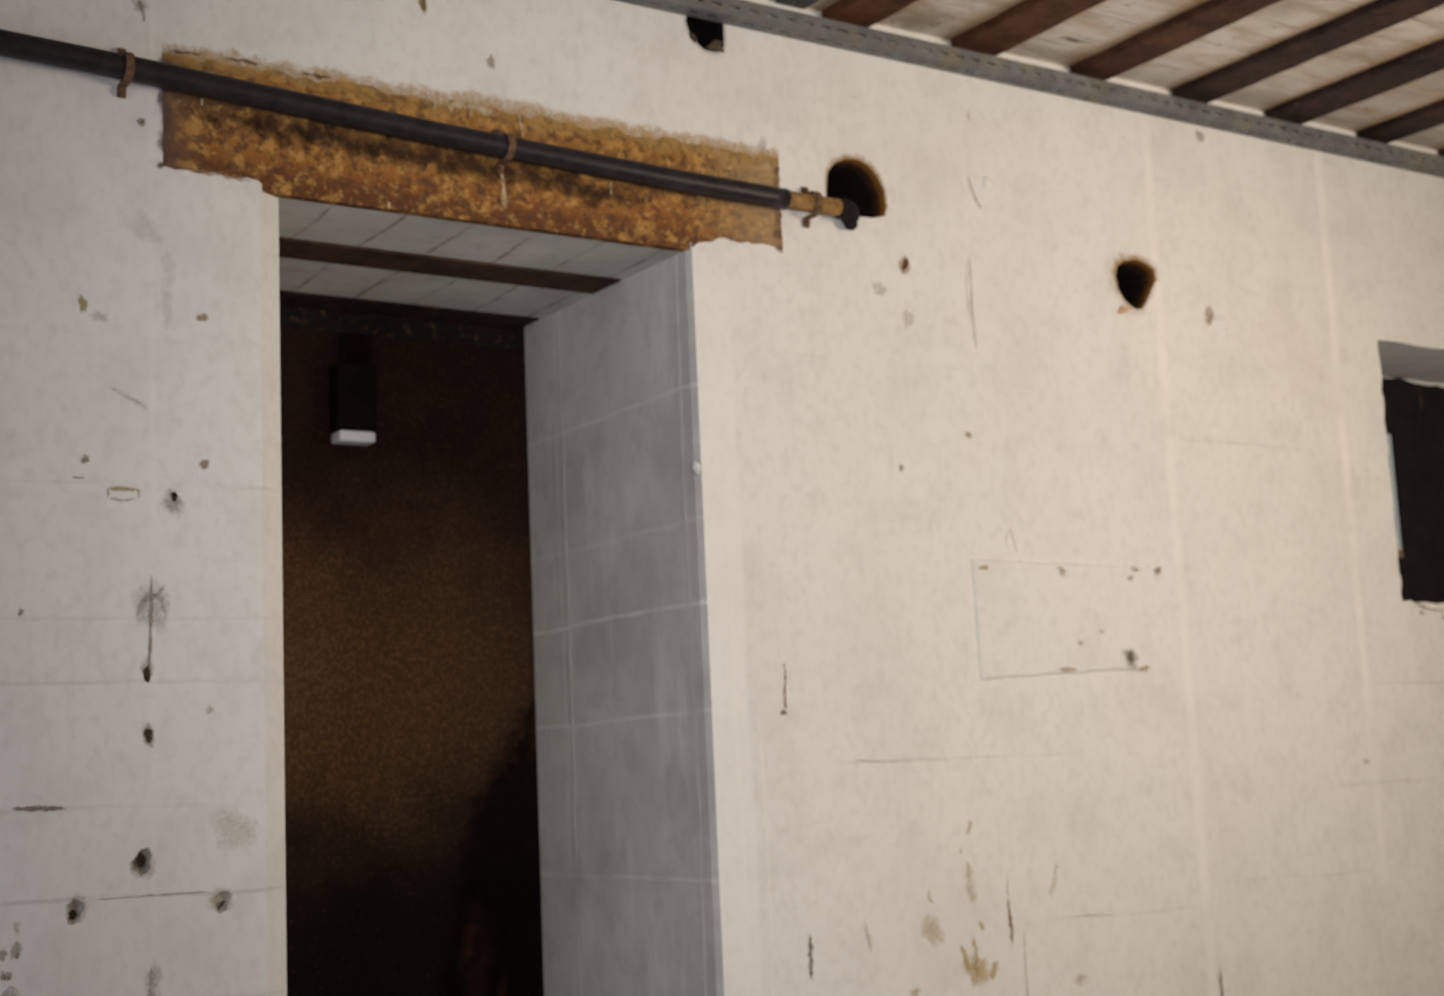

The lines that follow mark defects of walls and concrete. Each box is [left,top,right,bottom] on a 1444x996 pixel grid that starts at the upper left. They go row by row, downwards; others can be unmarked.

spalling [686,0,725,52]
spalling [826,156,887,218]
spalling [1114,257,1156,315]
spalling [130,848,153,877]
spalling [67,896,86,925]
spalling [211,890,232,914]